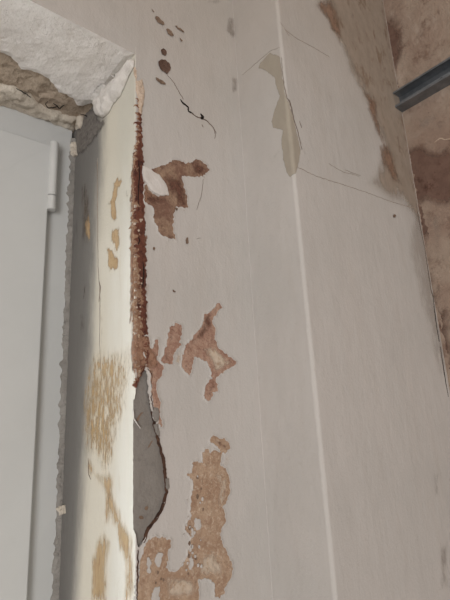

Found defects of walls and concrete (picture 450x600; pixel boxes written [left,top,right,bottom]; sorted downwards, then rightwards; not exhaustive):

peeling [0,52,135,153]
crack [167,75,216,135]
peeling [259,53,300,176]
leakage [329,0,450,235]
corrosion [129,67,157,388]
peeling [142,156,212,244]
peeling [132,300,239,600]